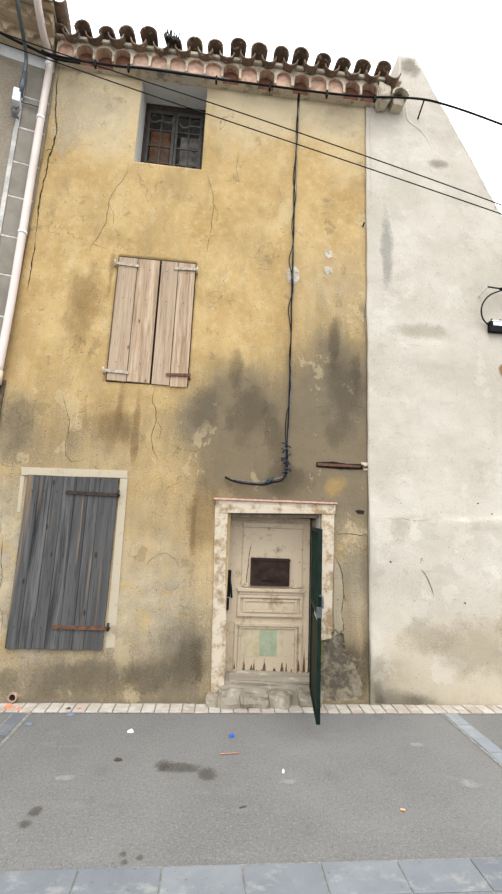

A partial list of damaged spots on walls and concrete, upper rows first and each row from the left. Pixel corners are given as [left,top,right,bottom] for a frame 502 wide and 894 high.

crack [27,66,60,290]
spalling [321,560,364,702]